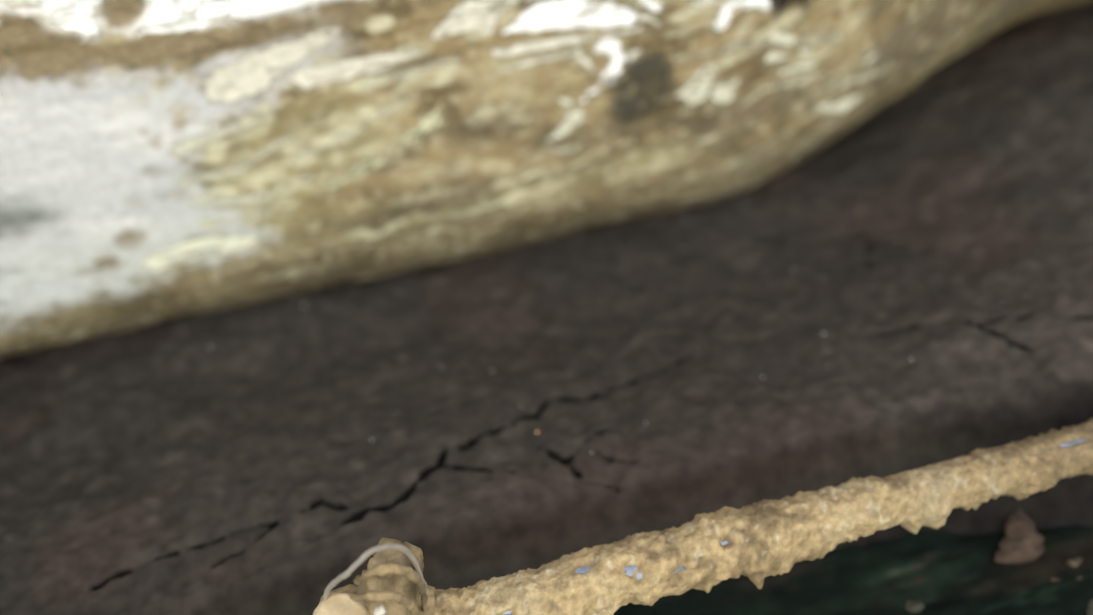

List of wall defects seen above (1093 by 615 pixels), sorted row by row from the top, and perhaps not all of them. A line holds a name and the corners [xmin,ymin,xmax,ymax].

peeling [138,0,324,36]
peeling [693,0,808,30]
peeling [432,0,662,77]
peeling [203,27,420,103]
peeling [672,31,900,114]
peeling [548,89,597,153]
damp [0,212,43,227]
peeling [139,236,259,272]
crack [259,356,692,537]
crack [157,538,241,568]
crack [92,571,132,591]